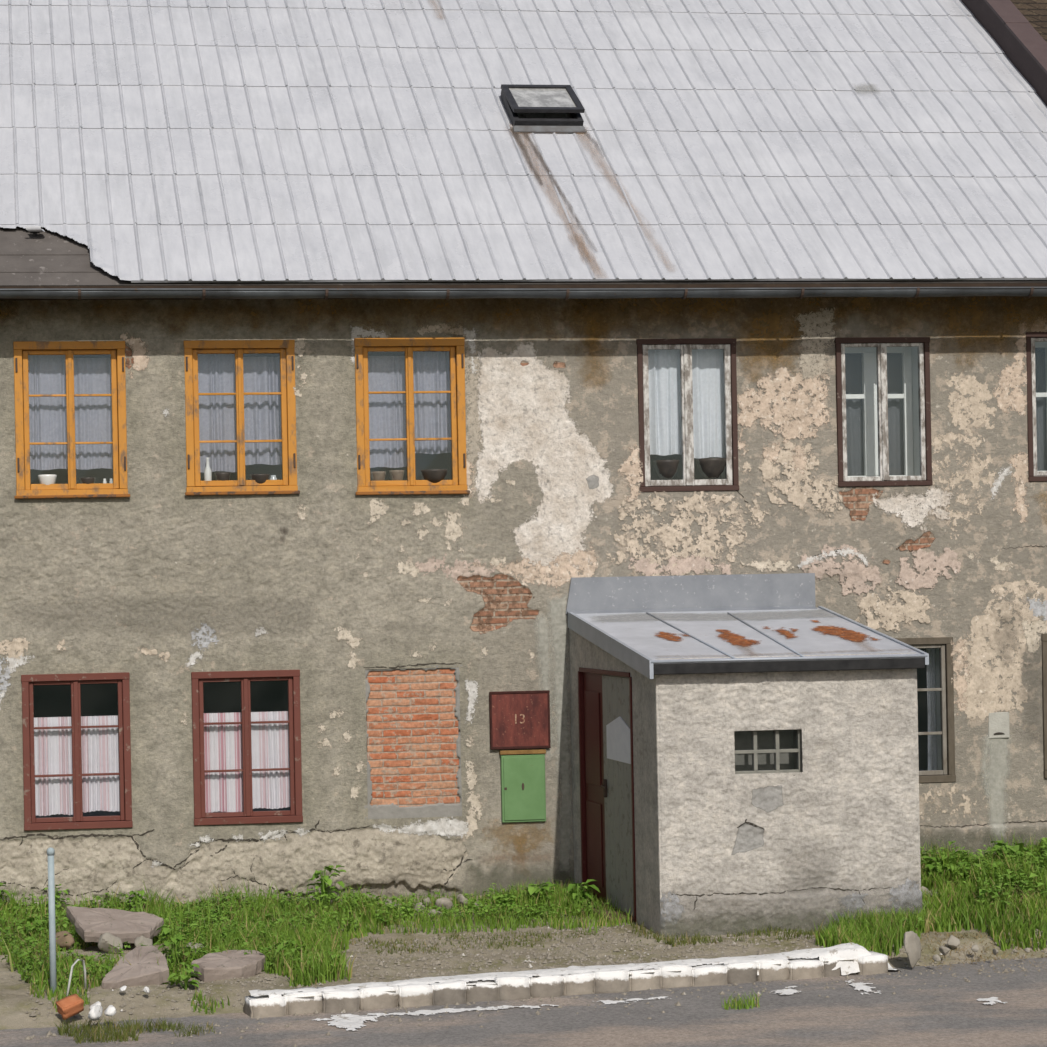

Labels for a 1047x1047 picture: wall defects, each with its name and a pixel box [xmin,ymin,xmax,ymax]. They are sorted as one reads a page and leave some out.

rust [510,128,565,198]
peeling [396,307,1047,658]
peeling [0,637,35,710]
peeling [334,626,363,670]
rust [654,632,689,641]
rust [717,629,760,647]
rust [765,626,799,639]
peeling [951,555,1047,728]
peeling [464,678,479,747]
crack [3,821,369,897]
spalling [0,760,484,910]
spalling [732,823,764,855]